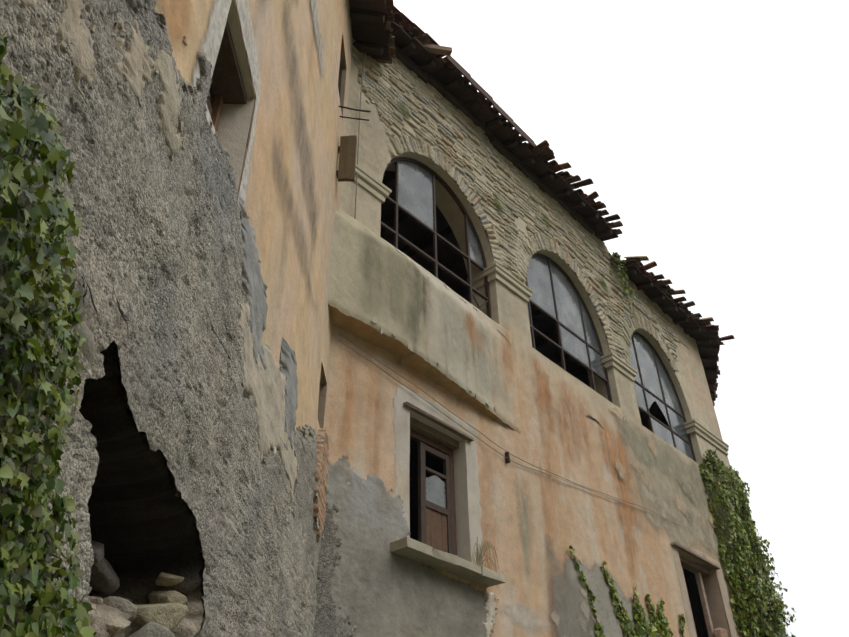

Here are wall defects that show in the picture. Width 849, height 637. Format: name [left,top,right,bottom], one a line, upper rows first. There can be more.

spalling [0,0,500,637]
flaking render [352,38,690,372]
spalling [551,558,651,637]